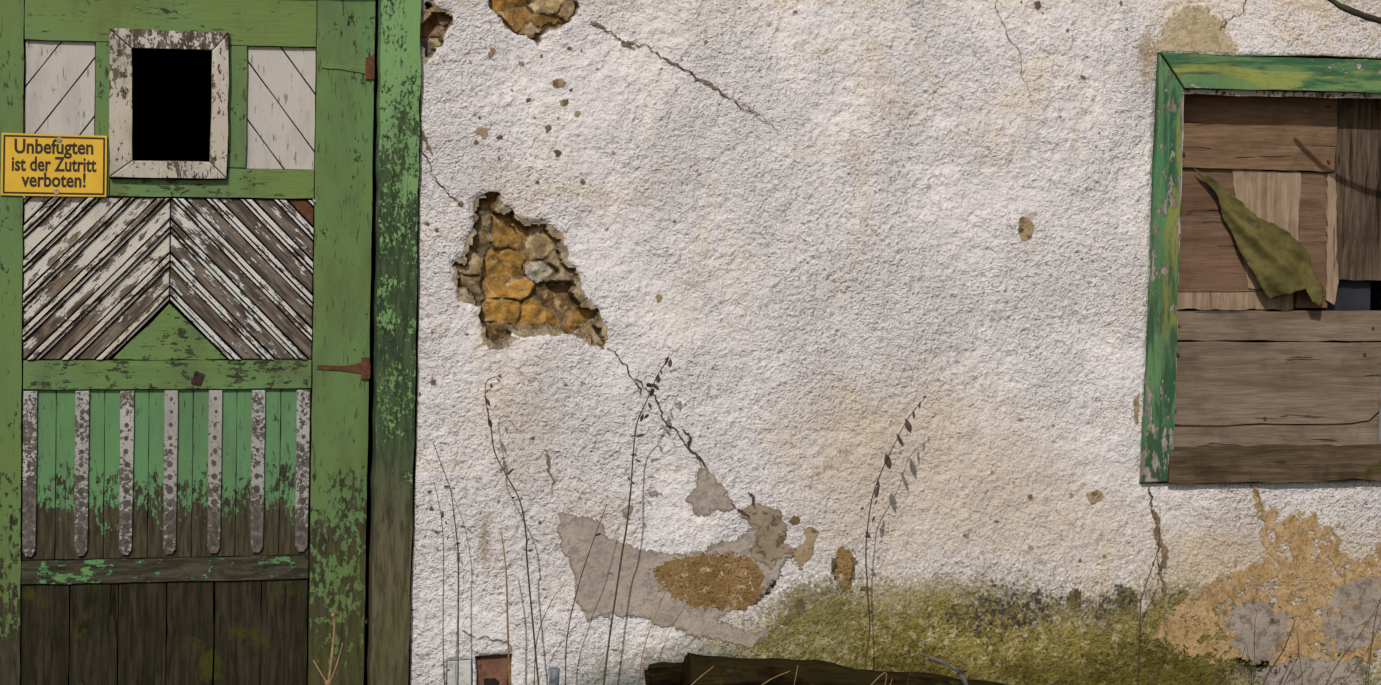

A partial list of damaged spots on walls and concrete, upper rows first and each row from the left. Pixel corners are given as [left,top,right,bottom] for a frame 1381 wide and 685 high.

spalling [420,0,454,66]
spalling [488,0,576,57]
spalling [511,79,580,132]
crack [590,21,779,136]
spalling [452,191,608,350]
crack [607,348,708,469]
peeling [556,467,819,648]
crack [731,492,756,520]
peeling [833,546,871,592]
water stain [771,575,1230,685]
crack [1148,487,1169,600]
peeling [1153,486,1381,685]